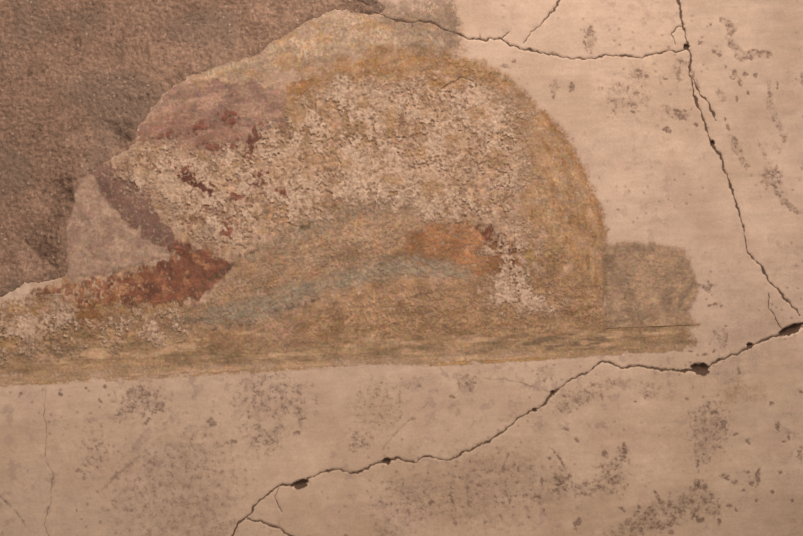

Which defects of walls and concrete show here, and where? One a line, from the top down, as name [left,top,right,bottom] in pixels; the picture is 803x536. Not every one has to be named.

spalling [0,0,571,367]
crack [232,0,803,536]